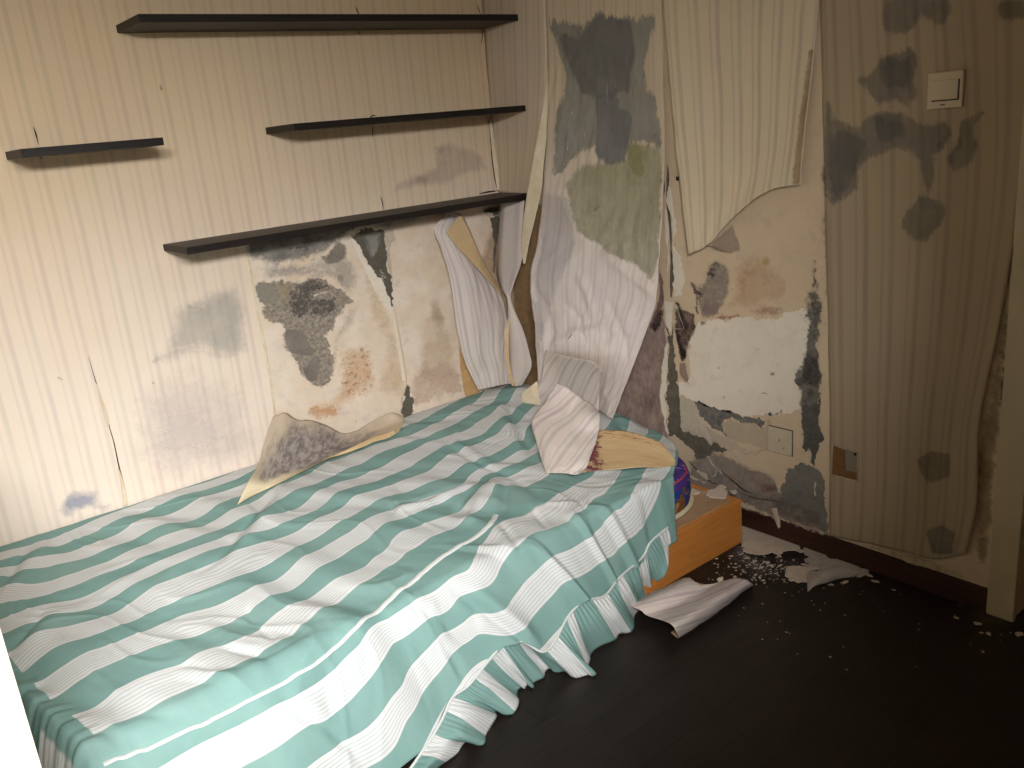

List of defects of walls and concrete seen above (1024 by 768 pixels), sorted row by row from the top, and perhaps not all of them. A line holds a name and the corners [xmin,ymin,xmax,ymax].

crack [109,424,124,482]
water stain [250,228,354,388]
peeling [246,204,508,433]
flaking render [691,484,737,499]
flaking render [678,308,816,467]
flaking render [777,445,858,532]